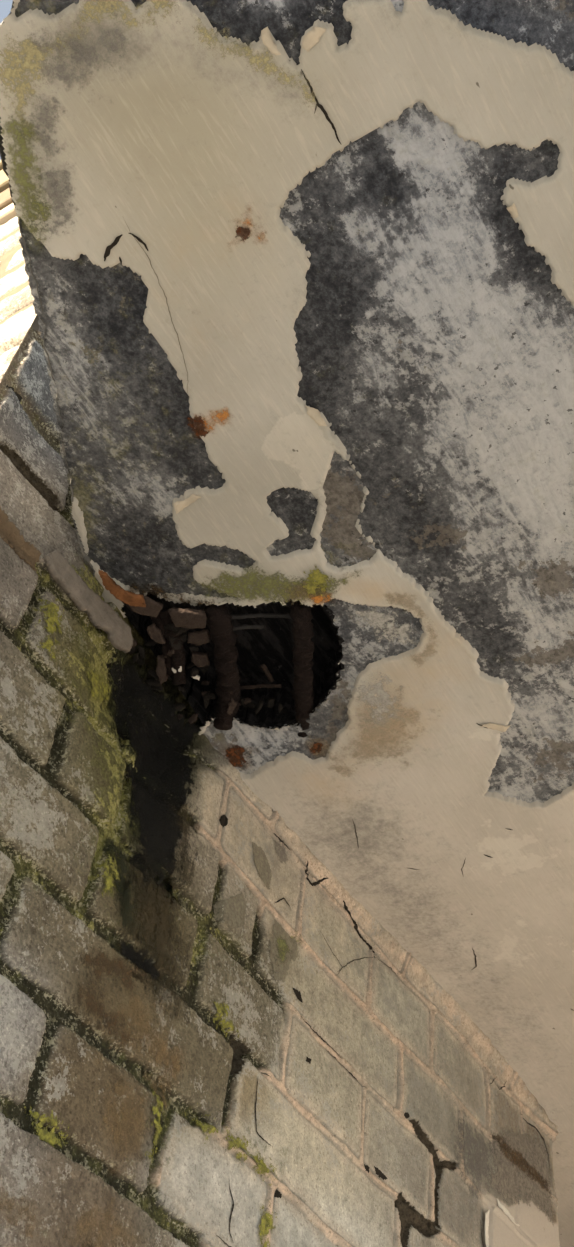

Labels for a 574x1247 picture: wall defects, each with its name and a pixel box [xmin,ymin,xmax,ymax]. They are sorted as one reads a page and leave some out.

peeling [13,0,79,17]
peeling [186,0,352,65]
peeling [427,0,574,71]
crack [301,69,341,144]
corrosion [235,220,263,241]
crack [104,224,189,399]
corrosion [187,410,229,439]
peeling [0,217,424,775]
peeling [266,101,574,803]
damp [101,645,200,1027]
crack [273,833,406,986]
peeling [455,1120,554,1247]